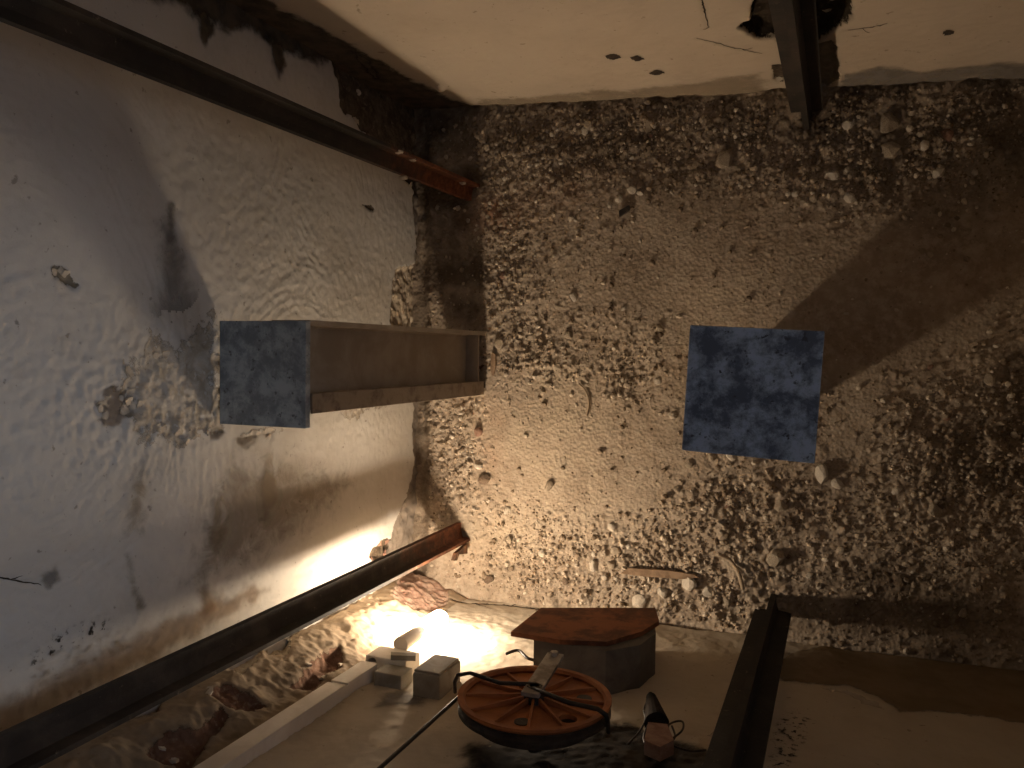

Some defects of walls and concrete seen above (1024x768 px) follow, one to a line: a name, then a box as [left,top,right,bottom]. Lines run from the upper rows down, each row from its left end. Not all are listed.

spalling [740,0,775,39]
spalling [816,0,852,86]
spalling [332,65,416,155]
peeling [96,309,224,449]